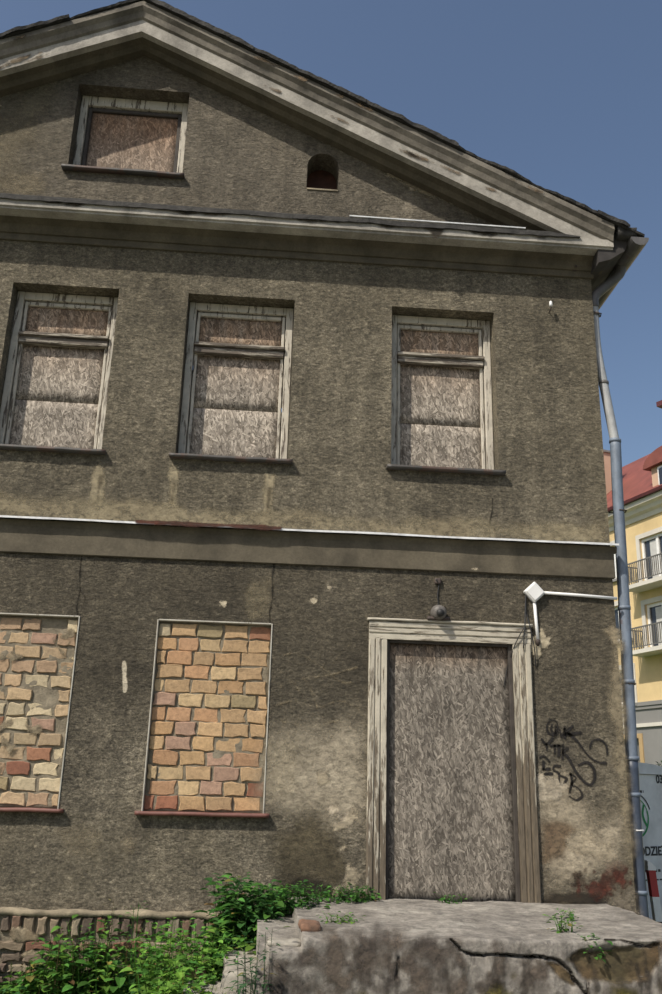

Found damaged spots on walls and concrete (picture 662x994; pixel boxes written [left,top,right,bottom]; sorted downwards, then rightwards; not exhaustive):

crack [453,942,589,994]